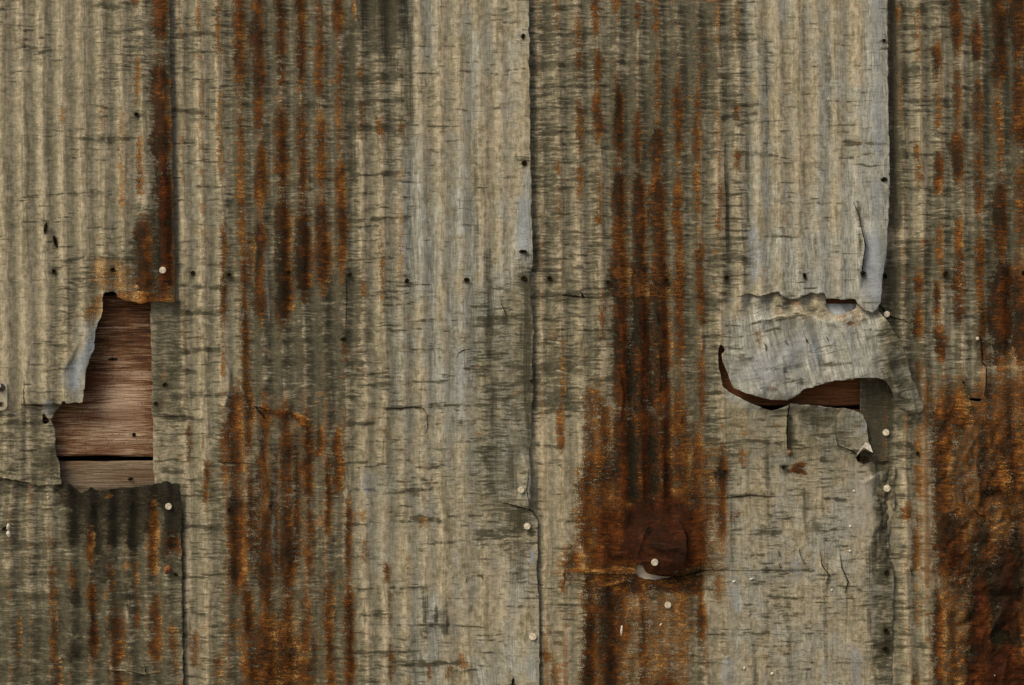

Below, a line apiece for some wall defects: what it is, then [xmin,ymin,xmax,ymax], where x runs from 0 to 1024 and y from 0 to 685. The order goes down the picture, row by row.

rust [84,0,182,327]
rust [48,492,225,685]
rust [195,0,384,685]
rust [383,562,393,623]
rust [555,0,750,685]
rust [898,0,1024,685]